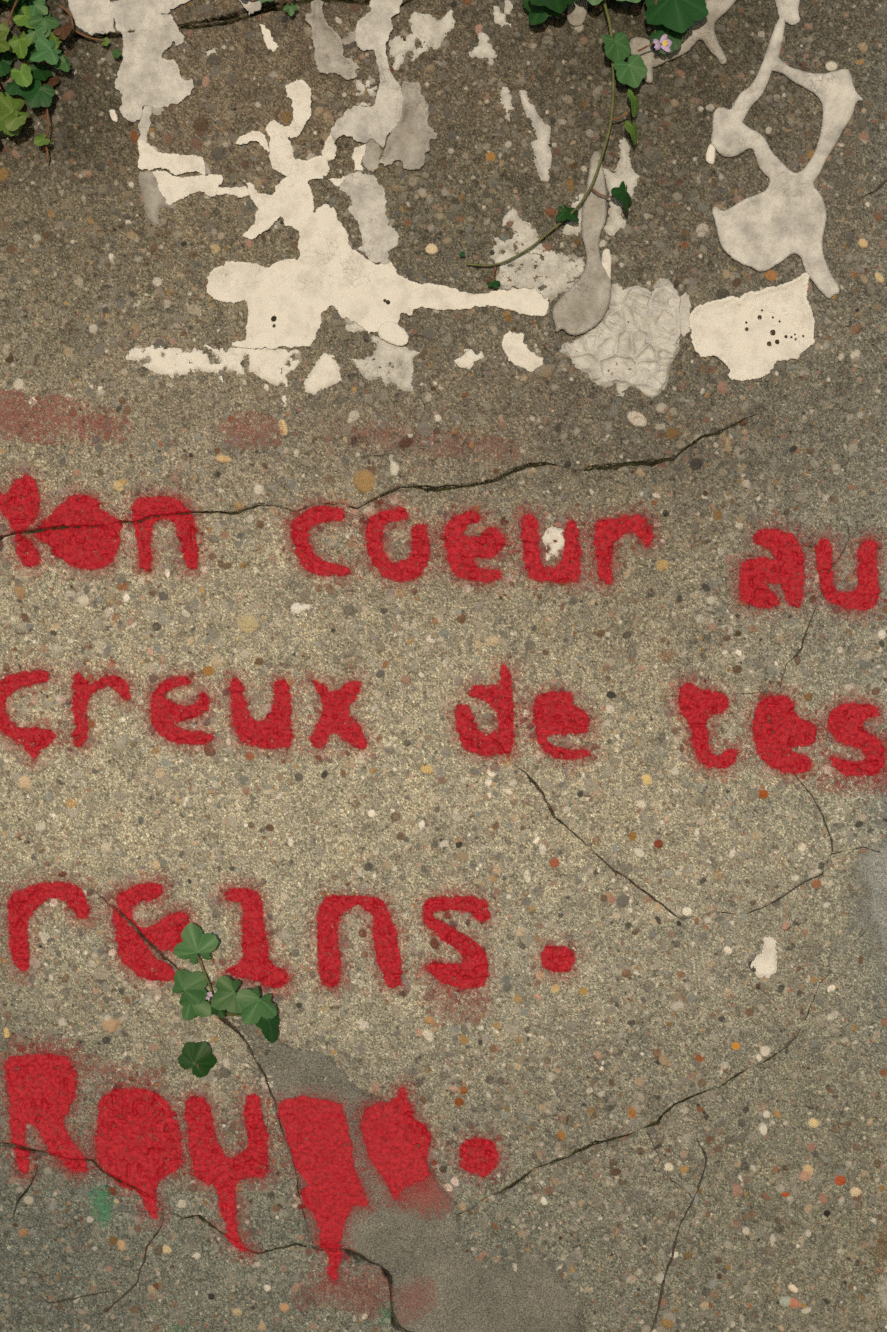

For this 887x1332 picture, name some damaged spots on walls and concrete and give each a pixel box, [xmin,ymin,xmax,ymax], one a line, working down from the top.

peeling [68,0,863,407]
crack [859,179,887,200]
crack [0,414,757,541]
crack [93,890,179,970]
crack [518,768,682,920]
crack [721,500,880,915]
crack [8,999,414,1332]
crack [495,932,866,1332]